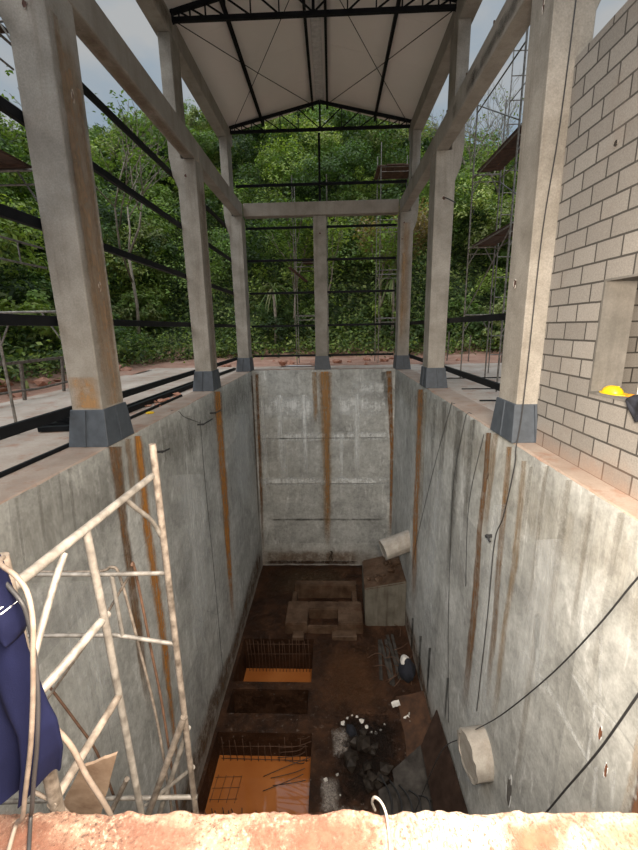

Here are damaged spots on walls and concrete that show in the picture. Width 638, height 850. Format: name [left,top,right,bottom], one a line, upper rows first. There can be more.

corrosion [109,436,174,729]
corrosion [215,391,232,591]
corrosion [312,371,330,518]
corrosion [413,389,423,567]
corrosion [467,433,497,667]
corrosion [491,447,512,647]